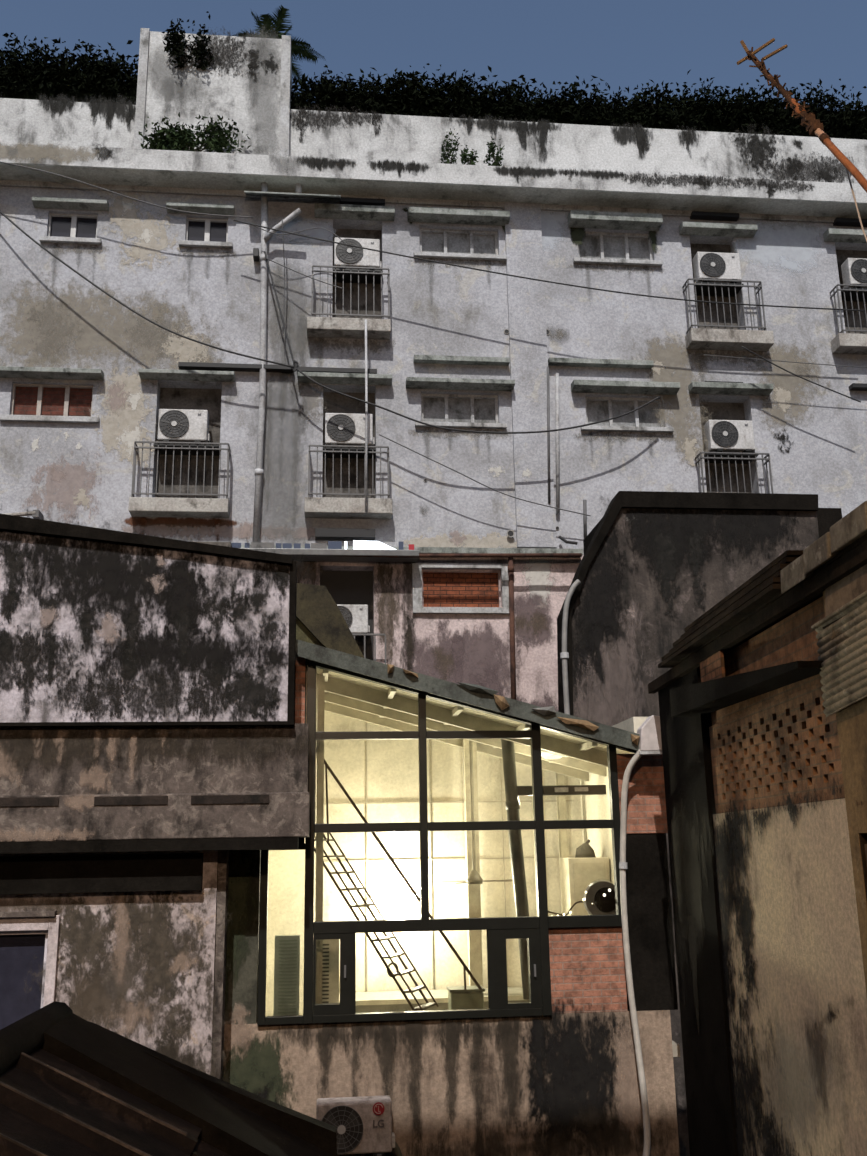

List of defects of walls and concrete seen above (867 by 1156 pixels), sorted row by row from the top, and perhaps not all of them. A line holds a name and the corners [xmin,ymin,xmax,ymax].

water stain [38,94,136,129]
water stain [297,156,356,171]
water stain [290,106,382,142]
water stain [370,159,429,177]
mould [449,115,857,198]
water stain [373,496,799,726]
water stain [0,518,322,789]
water stain [0,850,668,1156]
water stain [661,779,842,1156]